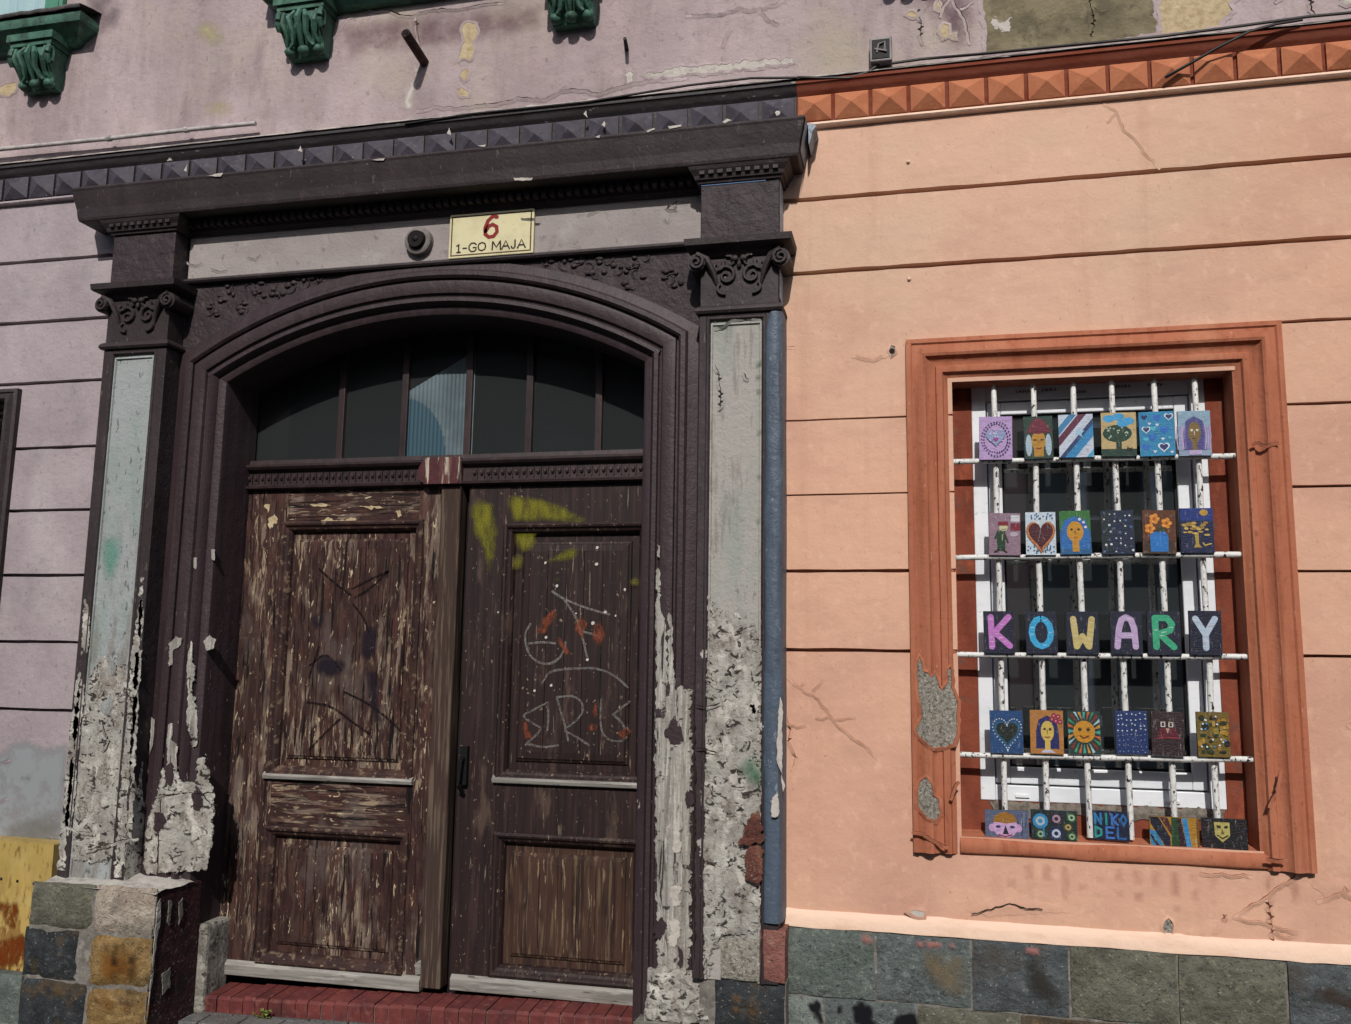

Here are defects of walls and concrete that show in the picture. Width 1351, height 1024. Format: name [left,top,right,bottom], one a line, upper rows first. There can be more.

flaking render [977,0,1239,56]
crack [1101,101,1161,170]
spalling [57,567,216,880]
spalling [652,544,785,975]
crack [786,676,879,772]
spalling [914,773,944,825]
spalling [913,653,962,752]
crack [1267,770,1283,809]
corrosion [0,904,25,966]
crack [1199,857,1351,941]